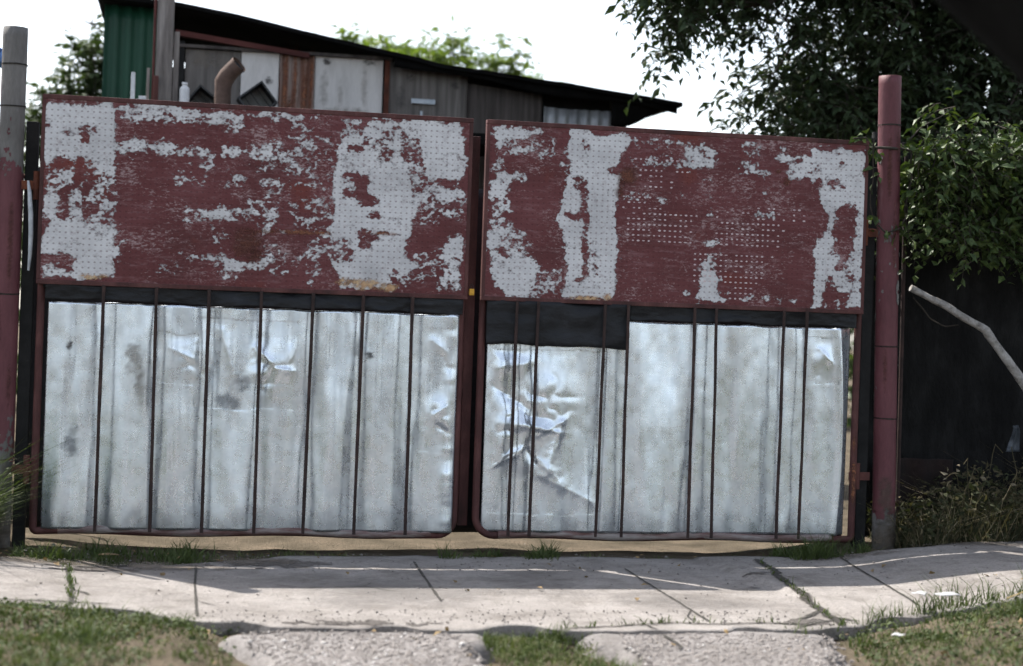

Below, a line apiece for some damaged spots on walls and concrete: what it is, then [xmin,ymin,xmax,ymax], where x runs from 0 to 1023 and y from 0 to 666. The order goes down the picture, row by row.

peeling [41,102,468,292]
peeling [486,125,805,304]
peeling [775,146,866,309]
crack [571,559,854,650]